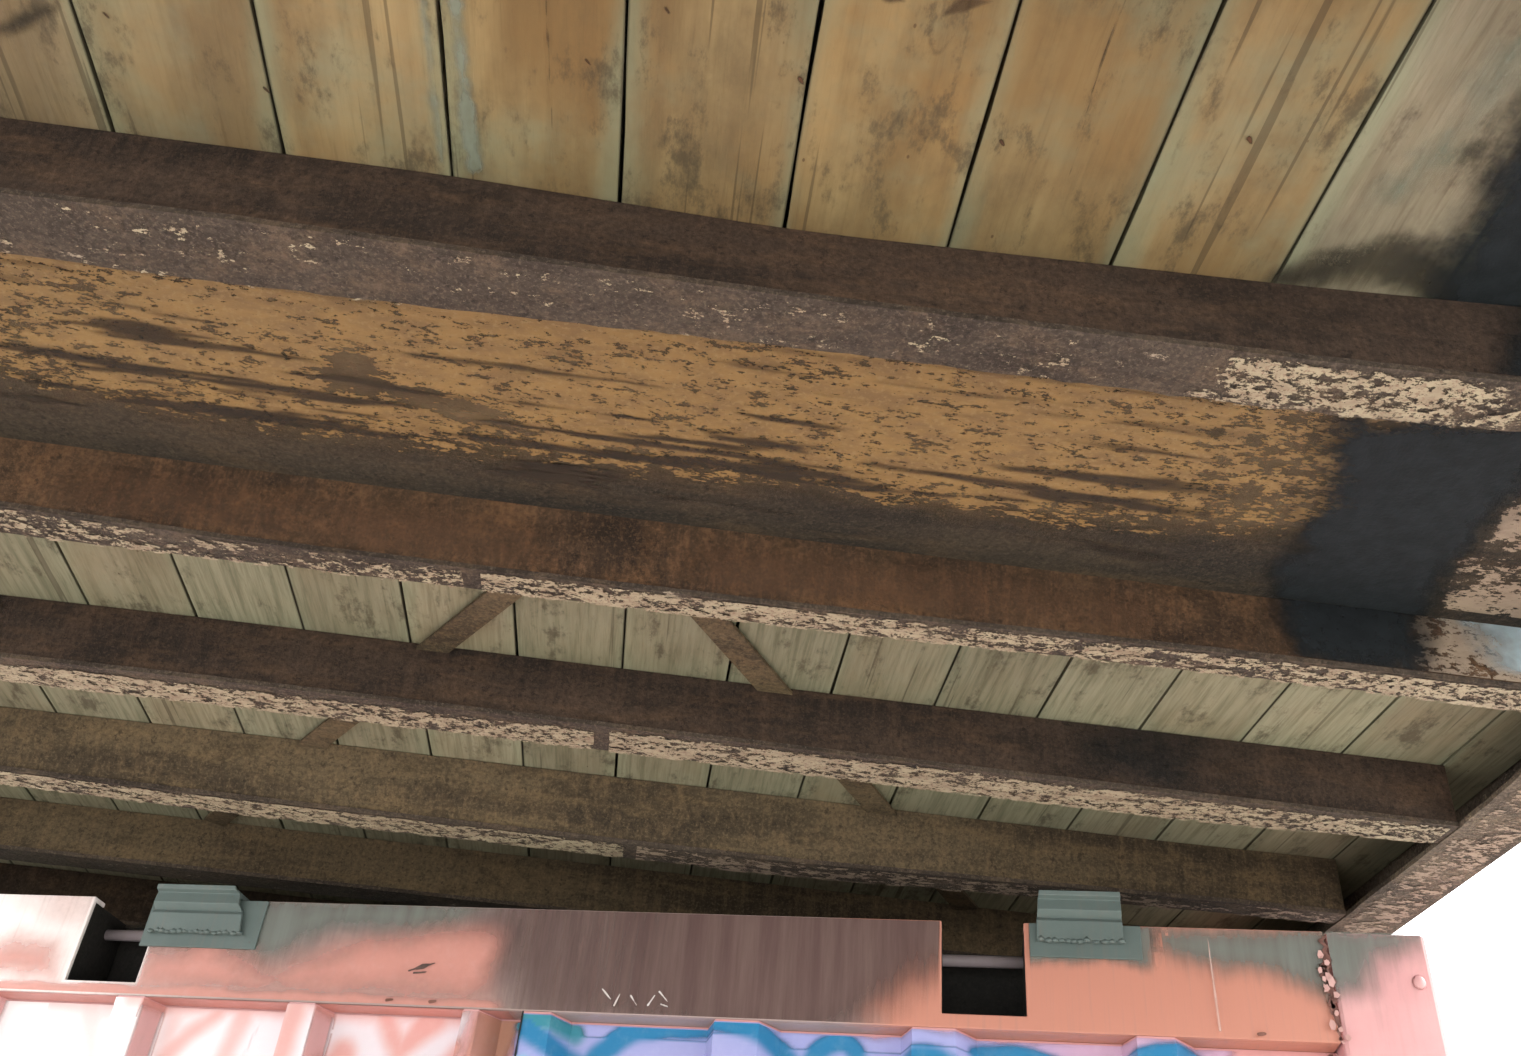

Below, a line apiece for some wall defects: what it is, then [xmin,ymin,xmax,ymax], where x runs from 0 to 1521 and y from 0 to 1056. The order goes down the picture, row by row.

peeling [0,204,1521,545]
peeling [0,501,1521,712]
peeling [0,664,1521,934]
crack [1316,936,1343,1056]